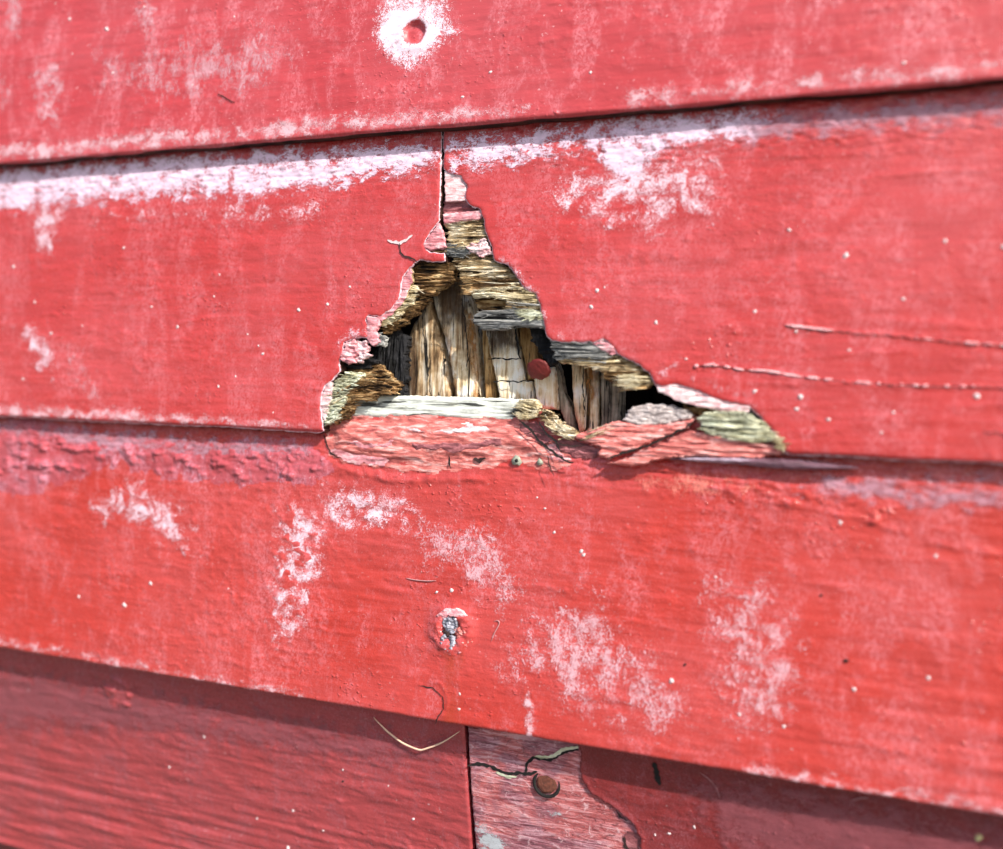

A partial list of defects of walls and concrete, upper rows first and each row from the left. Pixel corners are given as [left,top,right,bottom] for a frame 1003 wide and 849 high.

peeling [423,171,483,252]
peeling [466,238,493,258]
peeling [339,268,414,365]
peeling [594,339,617,355]
crack [785,324,1001,347]
crack [692,362,1003,390]
peeling [651,378,751,413]
peeling [320,381,600,475]
peeling [468,727,641,849]